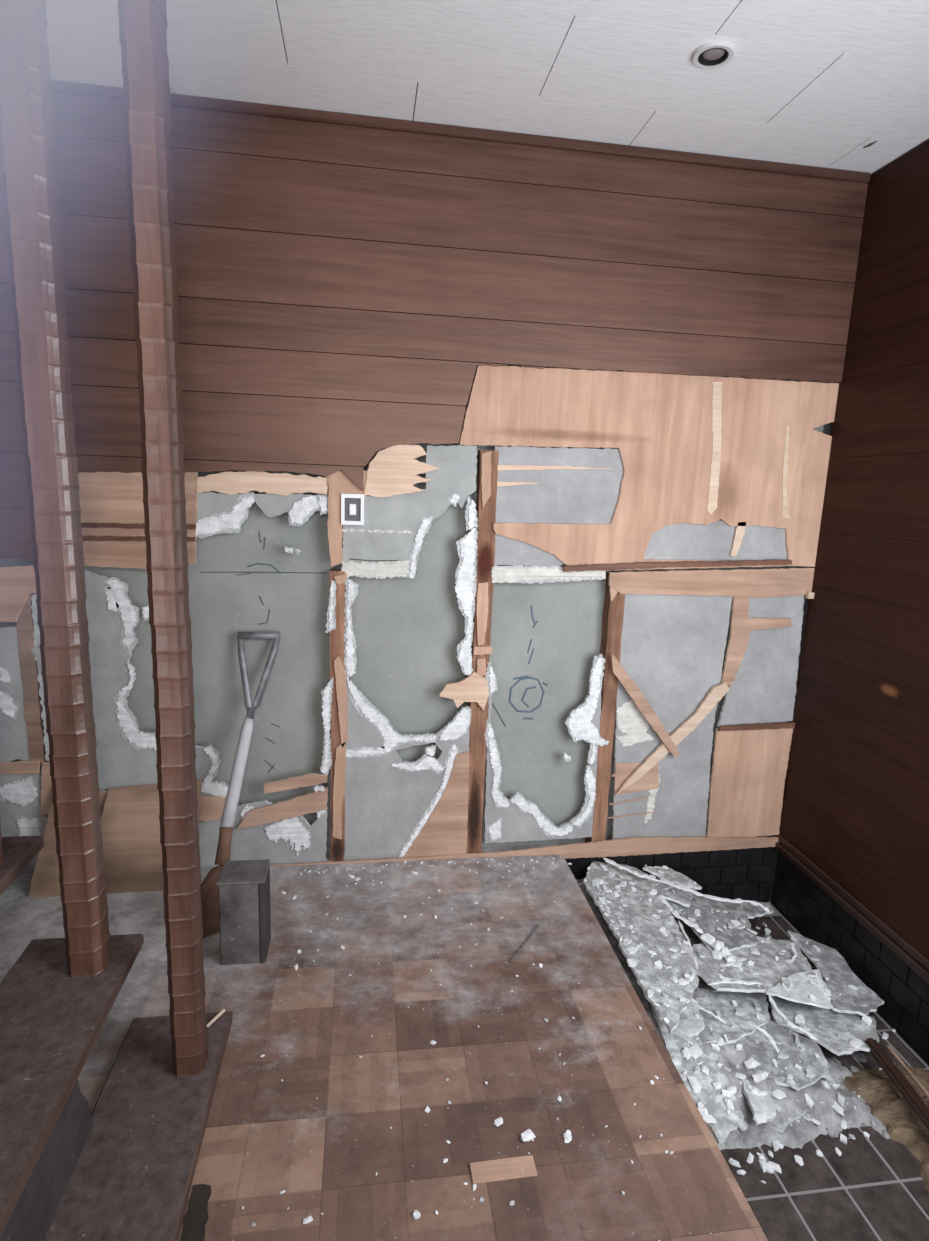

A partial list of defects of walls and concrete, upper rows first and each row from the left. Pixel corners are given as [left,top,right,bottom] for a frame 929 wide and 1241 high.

flaking render [196,492,255,539]
flaking render [288,494,328,526]
flaking render [446,492,606,696]
flaking render [0,667,19,719]
flaking render [31,645,42,671]
flaking render [103,576,157,753]
flaking render [314,516,471,858]
flaking render [0,775,42,836]
flaking render [201,744,229,797]
flaking render [485,655,654,842]
flaking render [644,766,661,825]
flaking render [264,816,311,855]